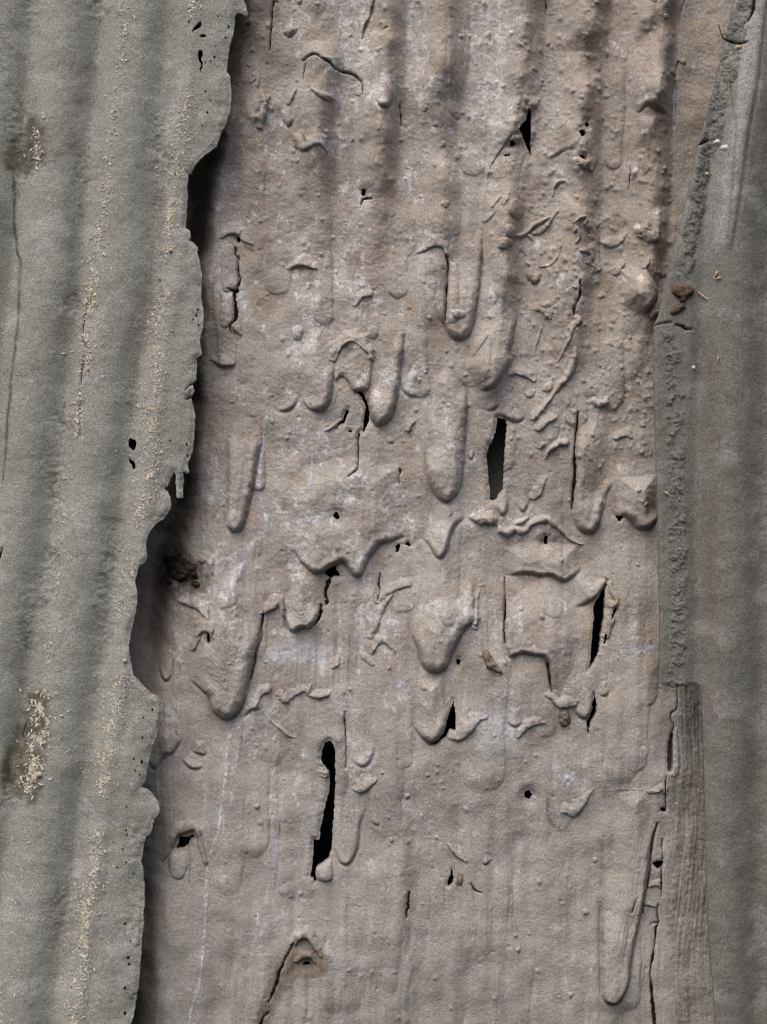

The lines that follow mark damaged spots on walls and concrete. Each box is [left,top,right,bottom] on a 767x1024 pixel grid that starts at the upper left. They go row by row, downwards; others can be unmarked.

damp [6,118,44,188]
crack [229,249,241,334]
crack [570,413,578,509]
spalling [162,552,200,588]
damp [5,693,47,800]
crack [632,777,667,1024]
crack [260,944,293,1024]